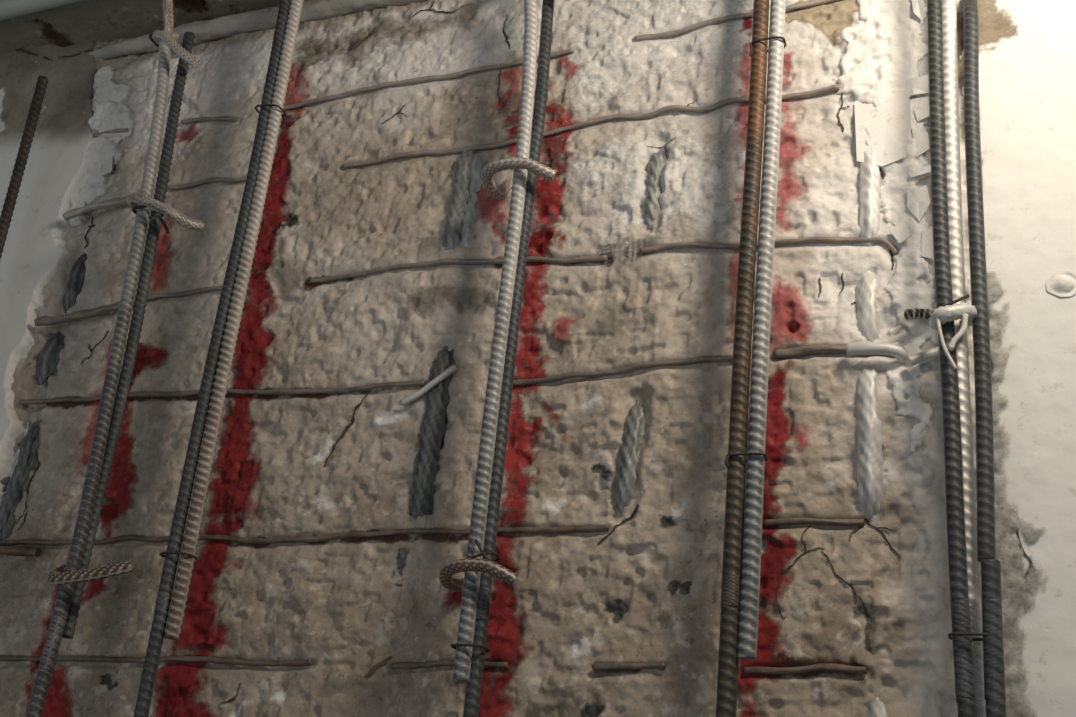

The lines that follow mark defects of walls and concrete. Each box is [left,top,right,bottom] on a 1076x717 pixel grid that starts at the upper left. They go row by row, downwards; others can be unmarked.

spalling [0,582,144,717]
spalling [0,0,291,657]
spalling [133,554,184,717]
crack [324,394,368,467]
spalling [160,0,958,717]
crack [775,525,866,619]
crack [849,518,901,559]
spalling [920,333,971,633]
spalling [941,0,1043,717]